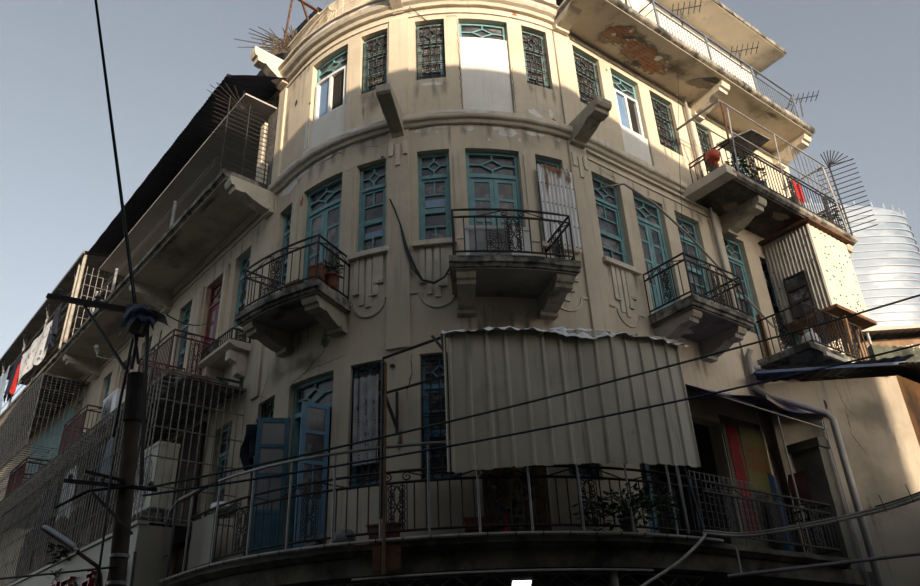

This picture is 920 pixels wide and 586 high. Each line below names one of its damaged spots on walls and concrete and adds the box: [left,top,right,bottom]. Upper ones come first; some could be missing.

spalling [598,21,672,76]